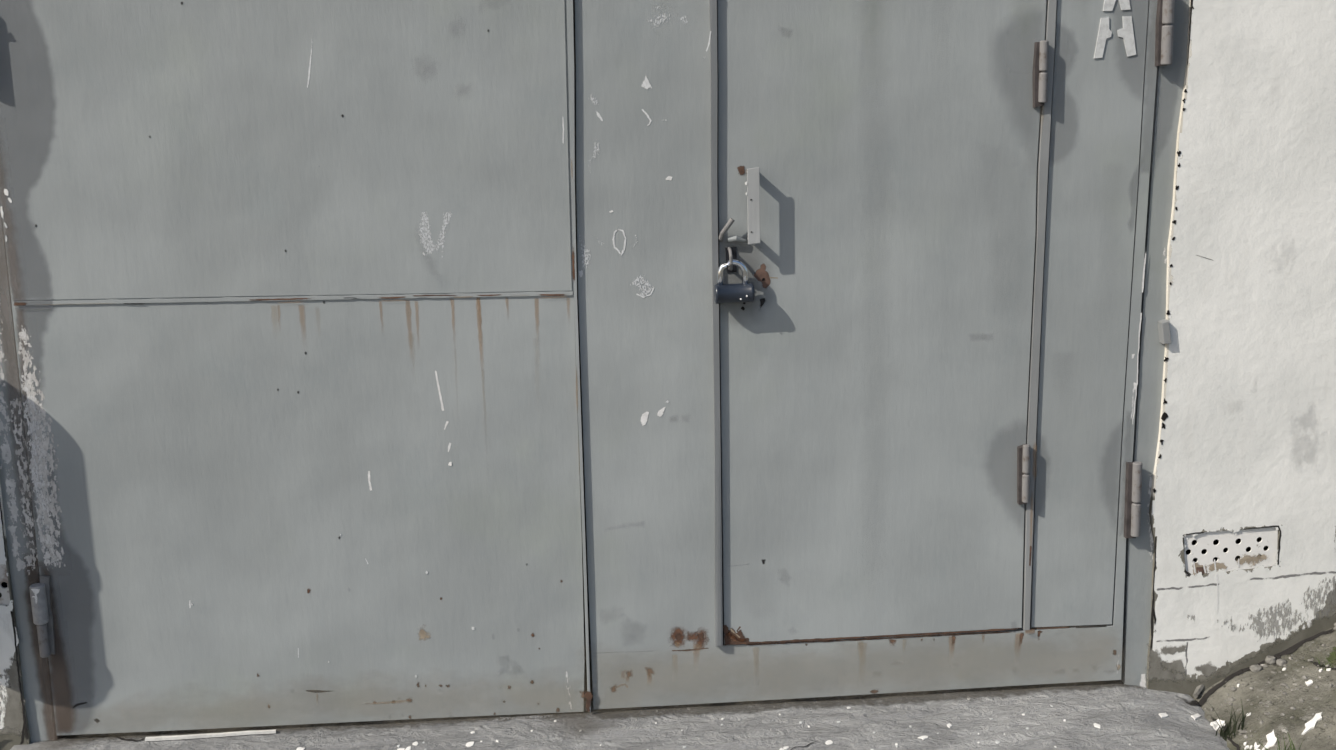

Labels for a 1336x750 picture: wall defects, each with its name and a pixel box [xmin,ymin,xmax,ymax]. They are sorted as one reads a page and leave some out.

corrosion [754,264,778,288]
peeling [0,321,65,574]
corrosion [671,627,708,651]
corrosion [723,625,1106,646]
crack [1182,628,1336,750]